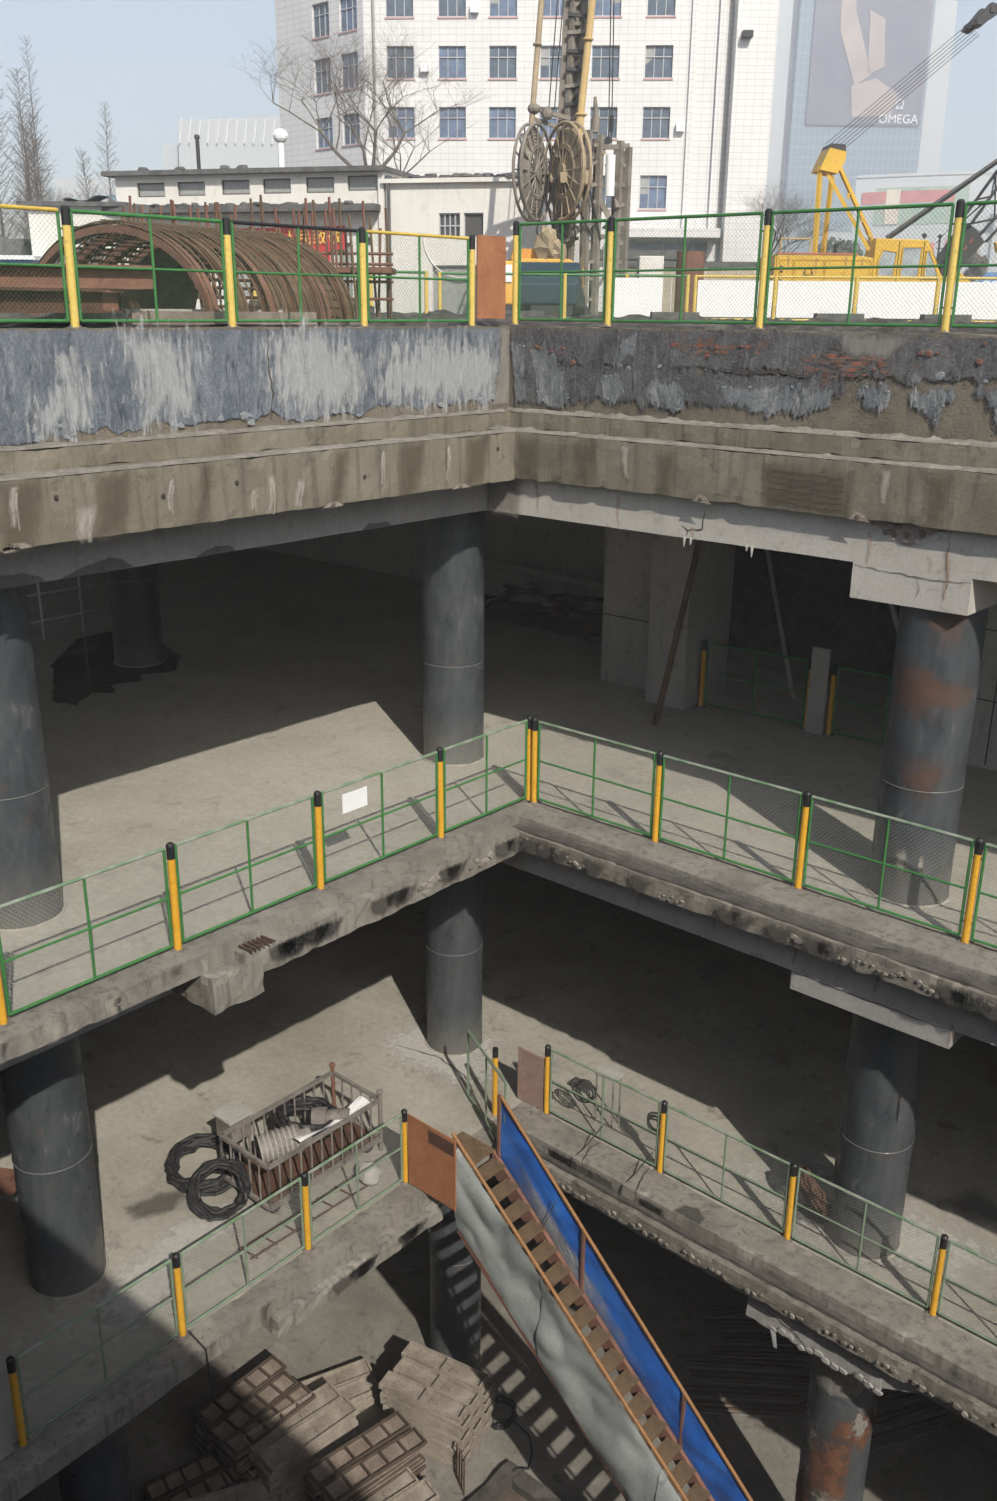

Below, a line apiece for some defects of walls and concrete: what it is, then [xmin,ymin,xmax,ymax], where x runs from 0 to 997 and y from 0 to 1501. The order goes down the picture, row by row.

efflorescence [28,322,205,444]
water stain [262,318,496,423]
peeling [0,325,997,446]
water stain [469,440,533,514]
spalling [0,543,32,554]
spalling [786,934,888,976]
spalling [606,1210,728,1280]
spalling [953,1402,997,1428]